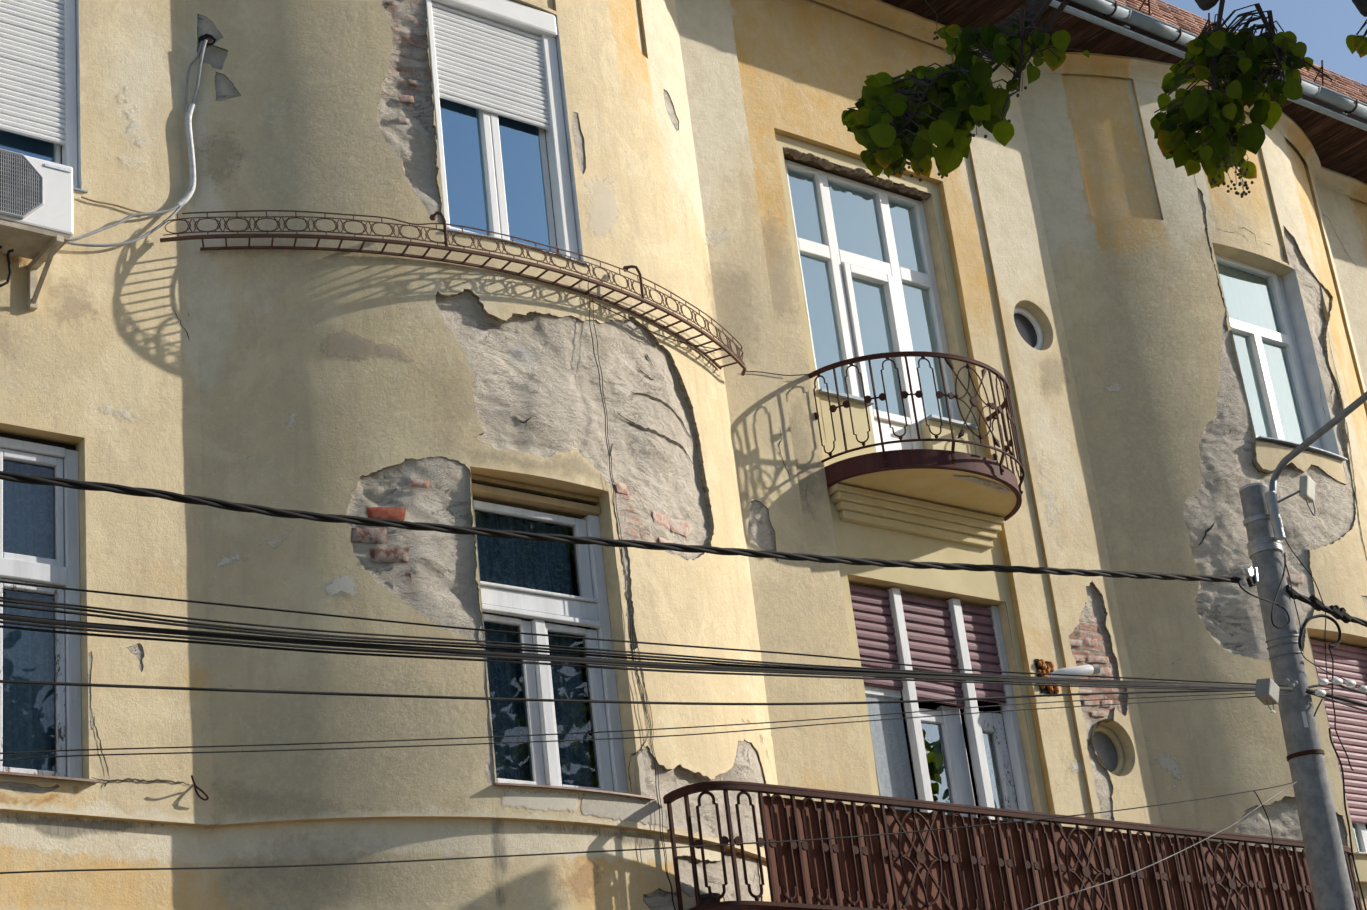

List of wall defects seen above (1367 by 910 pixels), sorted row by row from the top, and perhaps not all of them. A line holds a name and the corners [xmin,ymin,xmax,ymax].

spalling [376,0,443,223]
spalling [325,456,770,910]
spalling [435,289,714,650]
crack [611,488,654,792]
crack [609,353,694,465]
spalling [747,500,778,562]
spalling [1069,581,1128,820]
spalling [1183,188,1356,662]
spalling [1233,796,1304,852]
spalling [1336,812,1348,846]